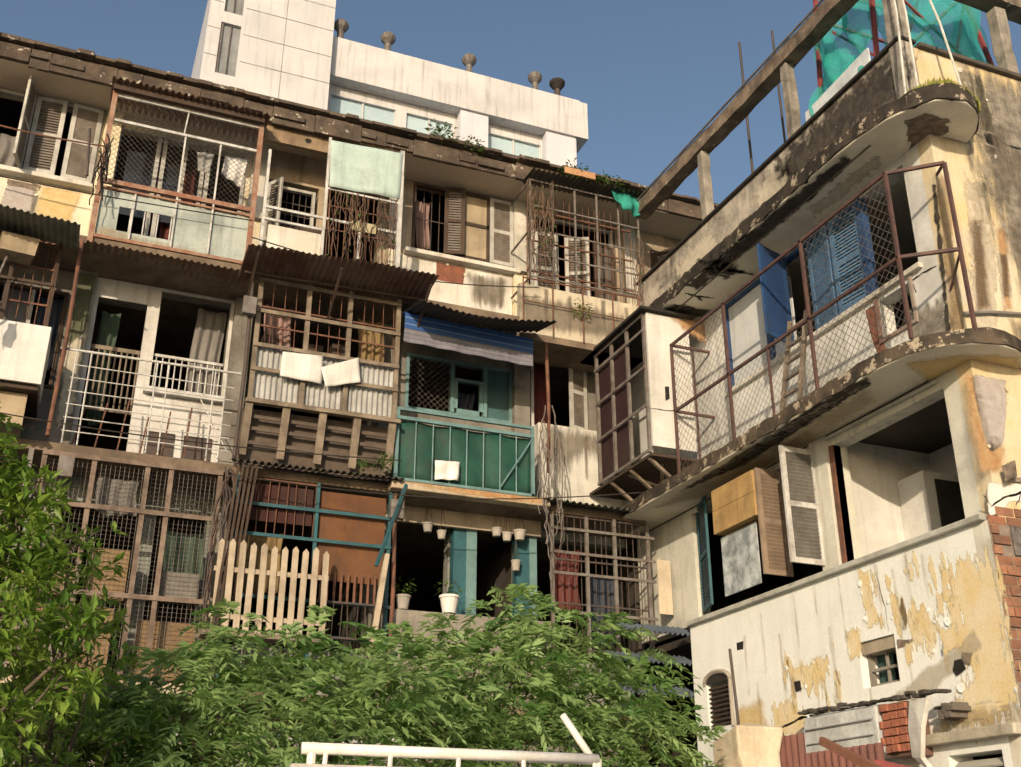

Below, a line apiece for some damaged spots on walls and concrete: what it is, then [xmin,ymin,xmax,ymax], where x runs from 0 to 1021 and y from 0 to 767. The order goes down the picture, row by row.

damp [684,157,850,290]
damp [774,59,897,181]
spalling [904,113,951,150]
damp [960,66,1021,277]
flaking render [972,375,1009,451]
peeling [771,460,1021,737]